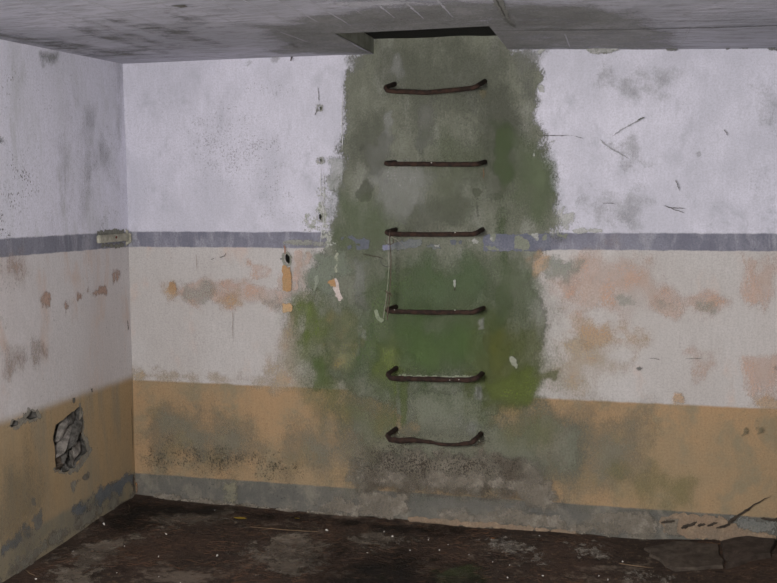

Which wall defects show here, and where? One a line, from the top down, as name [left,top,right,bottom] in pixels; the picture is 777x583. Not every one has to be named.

damp [149,0,675,513]
flaking render [10,408,41,430]
spalling [53,398,92,492]
flaking render [0,473,135,583]
crack [661,497,777,529]